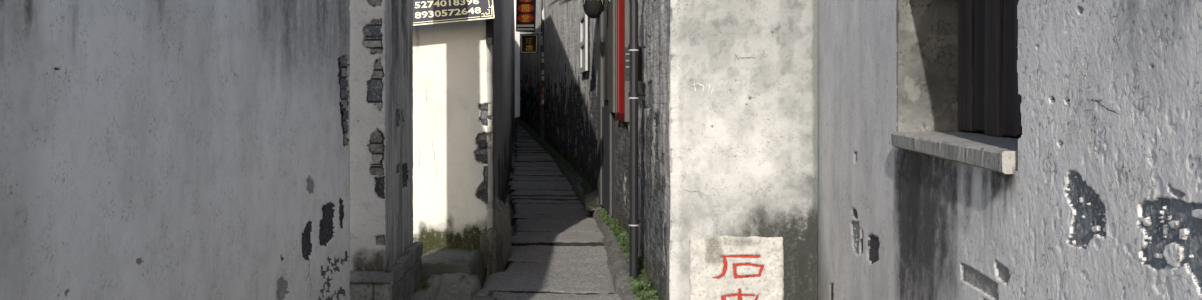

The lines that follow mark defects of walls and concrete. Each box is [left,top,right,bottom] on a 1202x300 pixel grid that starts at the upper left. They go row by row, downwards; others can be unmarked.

flaking render [338,56,350,146]
flaking render [362,0,405,127]
flaking render [474,103,488,204]
spalling [276,278,289,300]
spalling [302,198,349,300]
spalling [851,209,880,264]
damp [895,149,1013,300]
flaking render [961,261,1010,300]
spalling [1066,171,1106,249]
spalling [1138,184,1202,296]